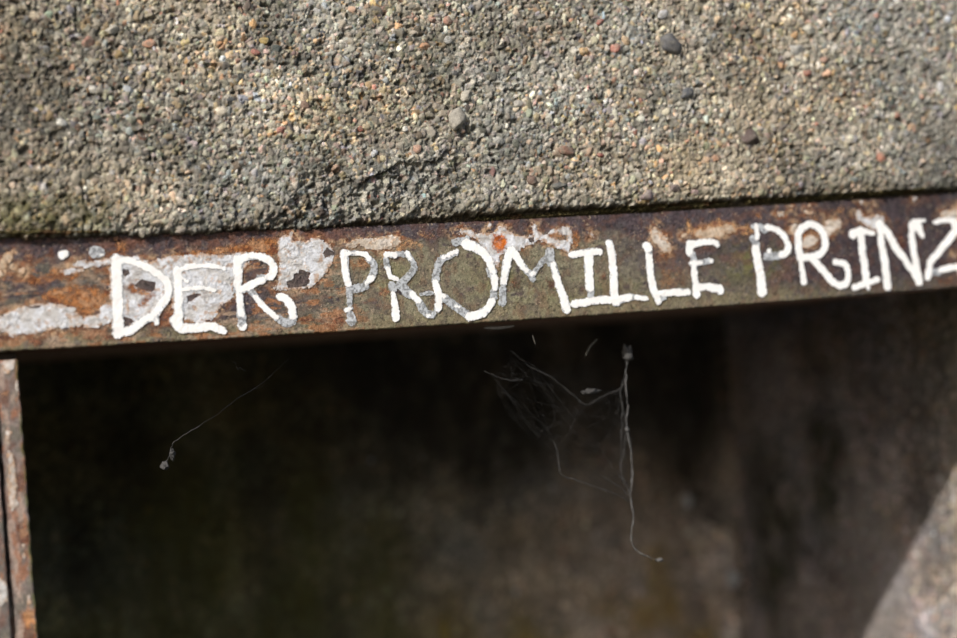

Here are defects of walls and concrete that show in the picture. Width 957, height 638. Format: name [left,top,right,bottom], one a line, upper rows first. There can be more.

corrosion [687,218,753,236]
corrosion [171,238,278,257]
corrosion [492,234,507,253]
corrosion [42,251,110,341]
corrosion [126,283,155,307]
corrosion [147,308,174,336]
corrosion [17,519,29,542]
corrosion [21,610,36,638]